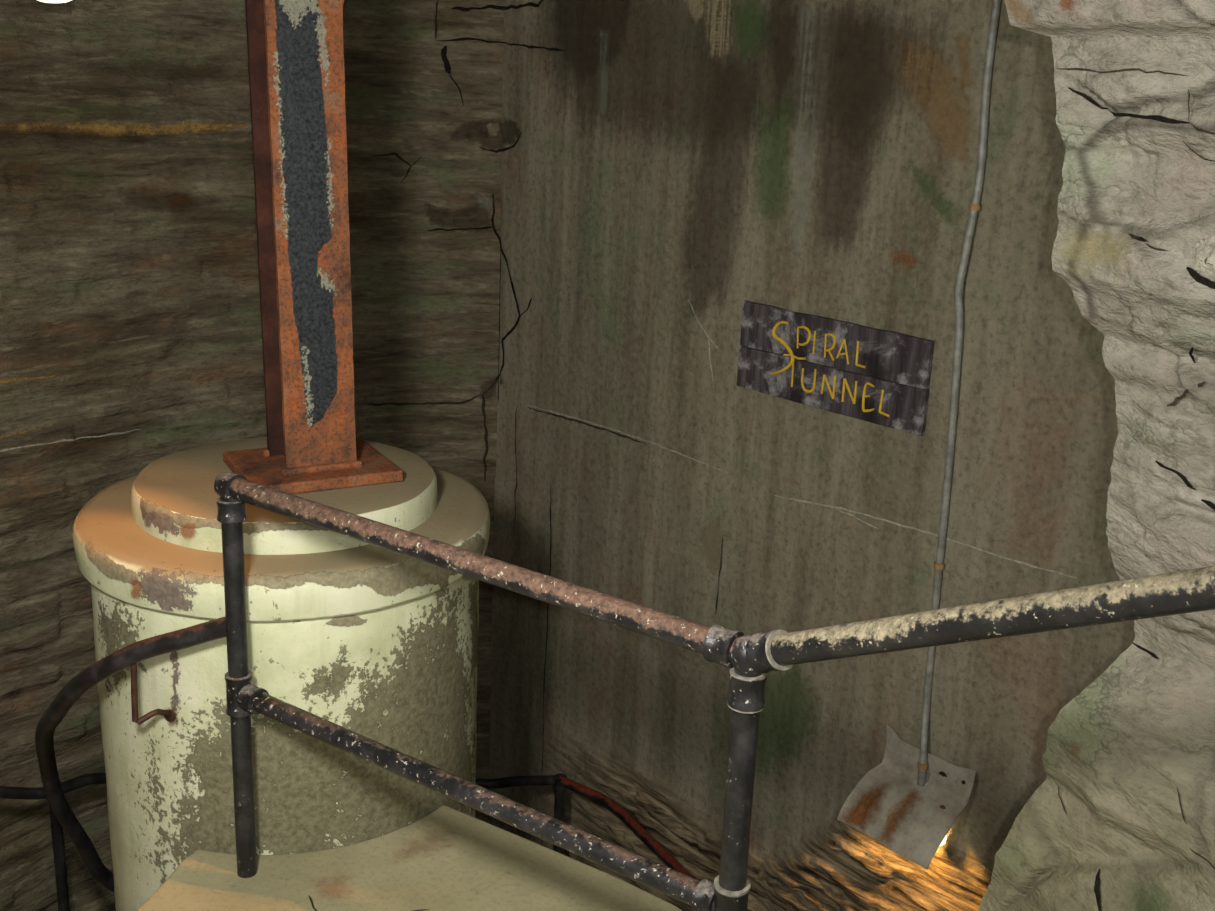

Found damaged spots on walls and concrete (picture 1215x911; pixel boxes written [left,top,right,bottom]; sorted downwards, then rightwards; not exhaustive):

crack [435,0,567,106]
damp [688,0,733,55]
crack [1055,68,1215,162]
crack [367,194,728,527]
peeling [140,498,221,537]
peeling [243,522,328,535]
crack [1155,461,1215,510]
peeling [85,542,224,657]
peeling [245,559,479,782]
peeling [133,697,236,886]
peeling [251,714,473,855]
crack [1094,869,1102,911]